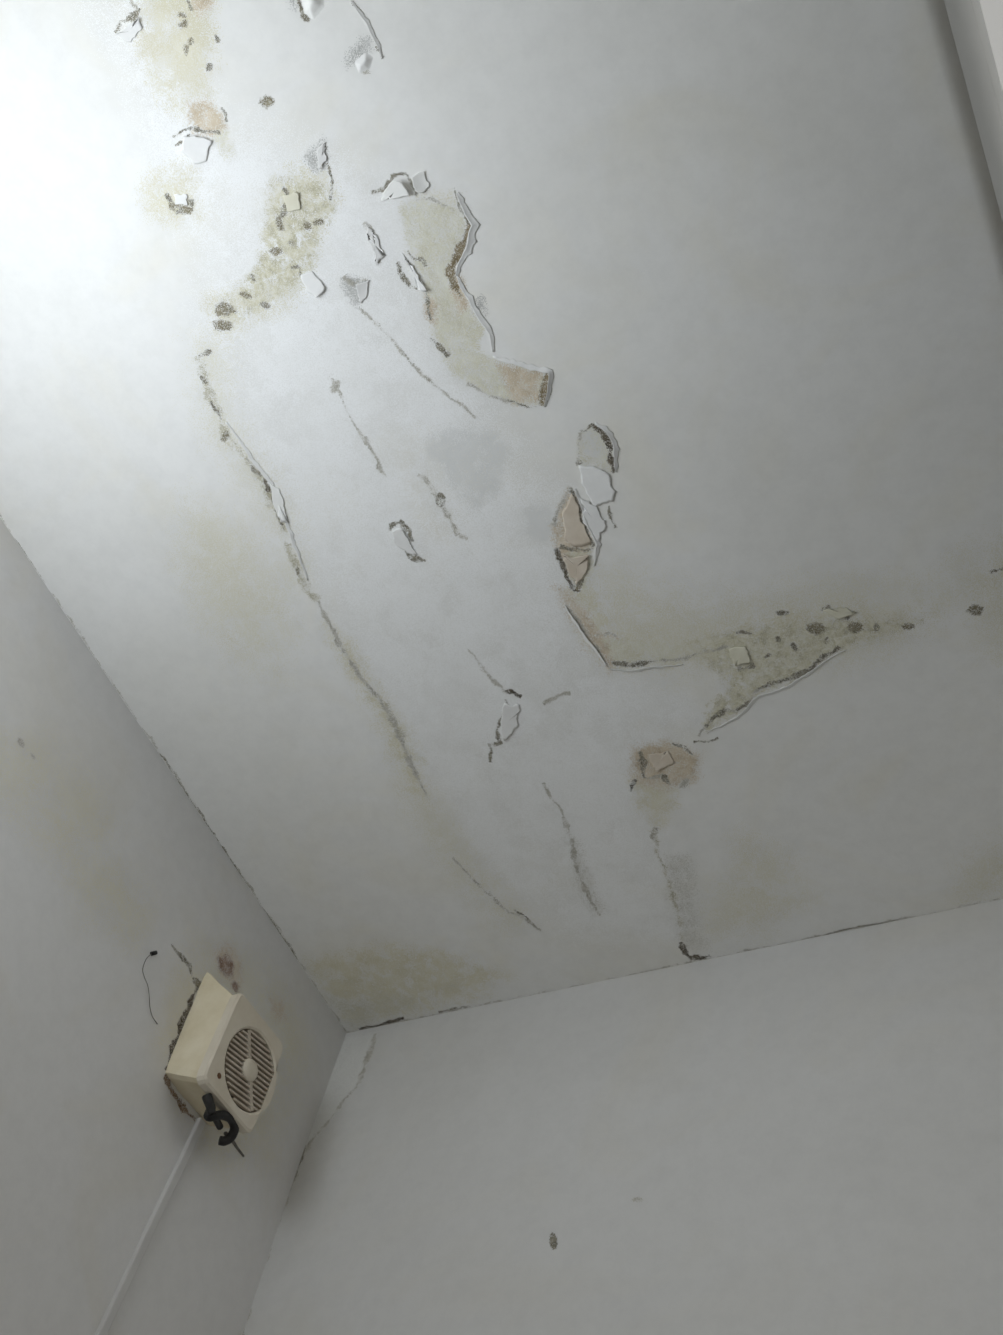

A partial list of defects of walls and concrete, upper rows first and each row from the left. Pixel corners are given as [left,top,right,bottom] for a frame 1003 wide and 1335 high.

crack [194,350,426,795]
crack [329,376,468,540]
crack [361,308,475,418]
peeling [371,171,554,408]
peeling [522,422,926,840]
damp [561,516,1003,697]